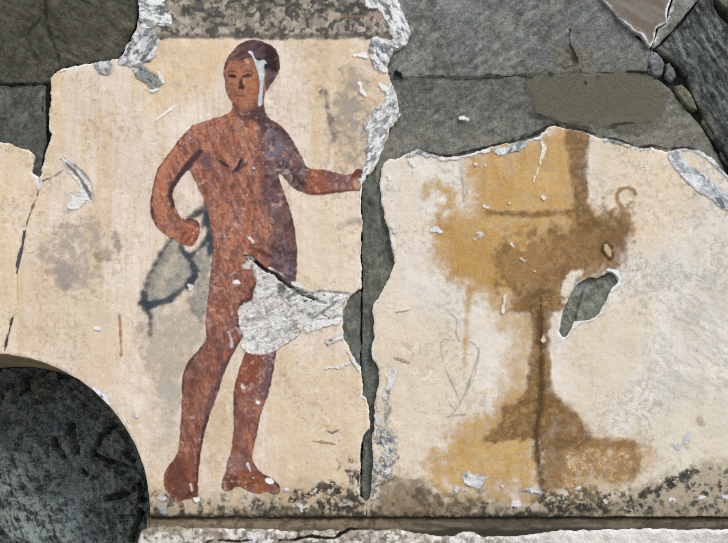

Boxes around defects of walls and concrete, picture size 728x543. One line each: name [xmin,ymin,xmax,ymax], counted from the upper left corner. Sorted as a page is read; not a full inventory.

flaking render [93,0,172,92]
peeling [248,51,266,106]
flaking render [353,0,411,73]
flaking render [359,82,400,204]
crack [16,171,62,273]
leakage [435,129,580,309]
crack [4,317,13,351]
flaking render [228,255,352,355]
leakage [430,327,538,500]
mould [275,458,363,516]
leakage [372,475,436,515]
mould [539,462,728,517]